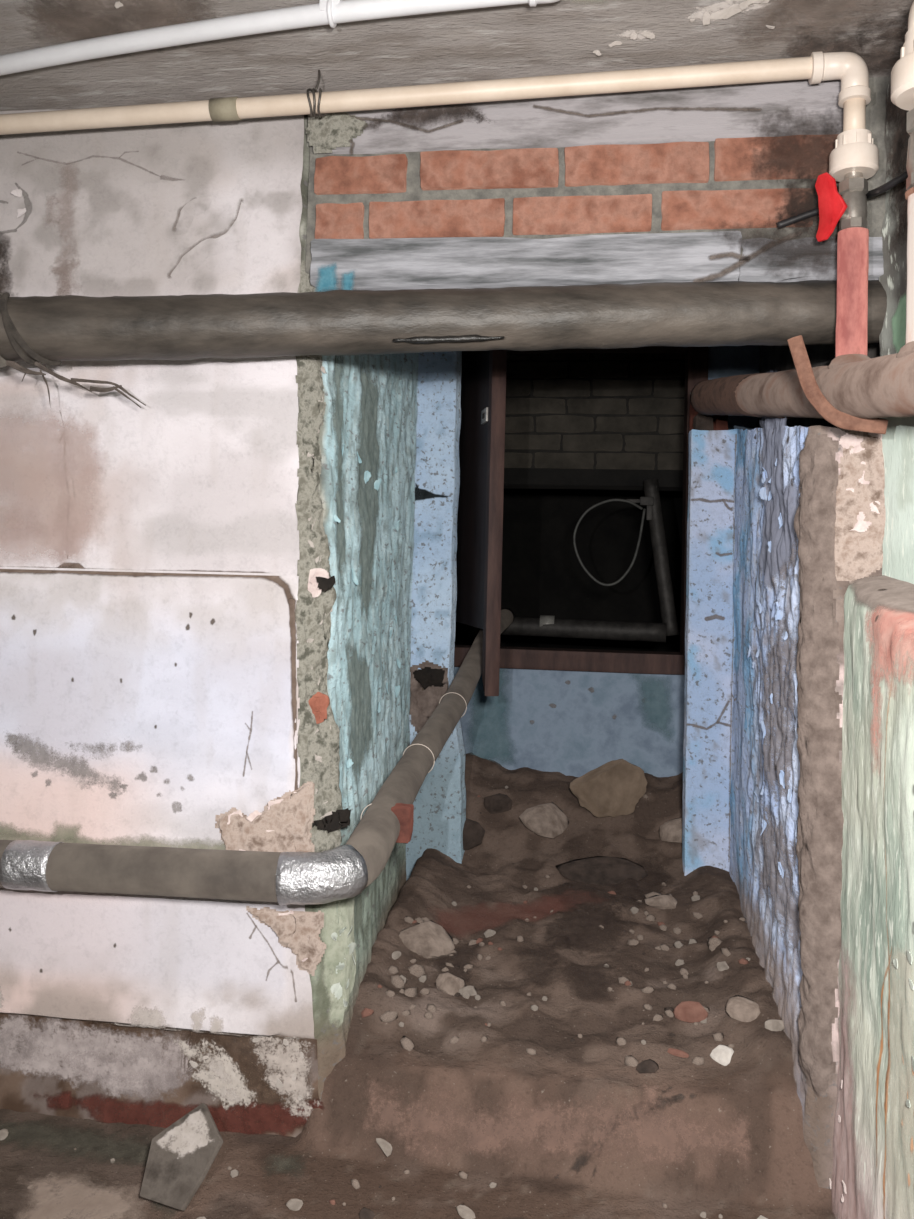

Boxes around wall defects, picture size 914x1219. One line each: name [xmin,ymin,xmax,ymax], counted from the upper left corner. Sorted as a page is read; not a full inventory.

damp [38,0,195,42]
crack [17,151,182,181]
crack [349,115,463,155]
crack [533,105,761,117]
damp [0,419,96,554]
damp [7,735,193,812]
spalling [747,417,914,1097]
damp [0,1014,309,1108]